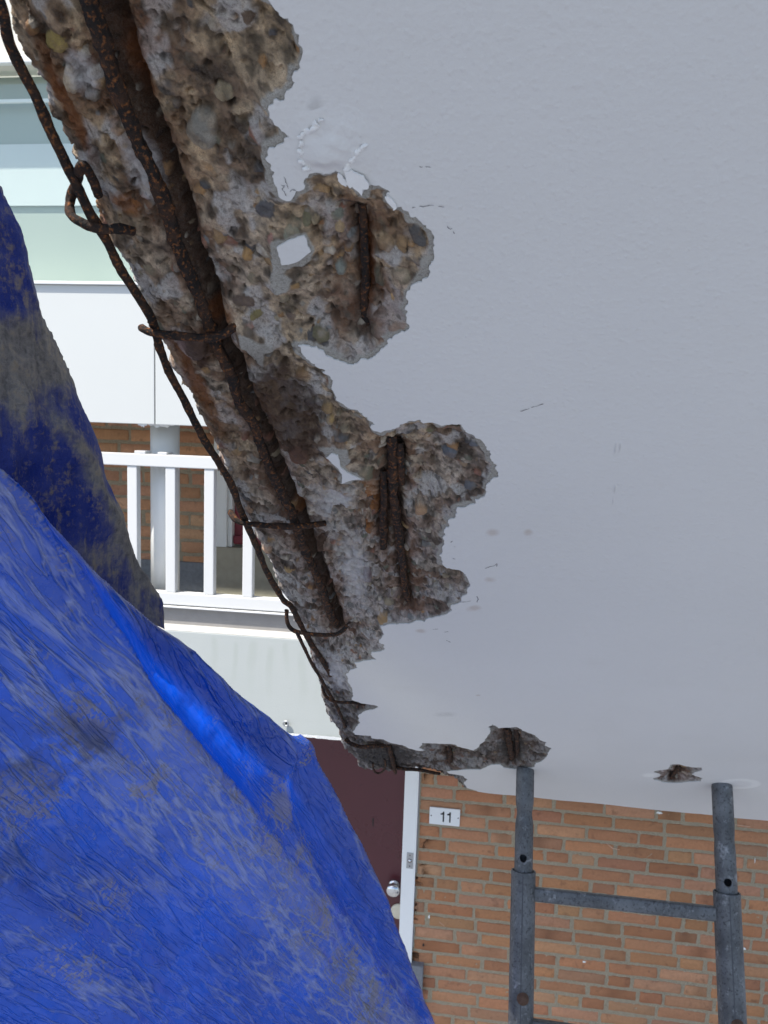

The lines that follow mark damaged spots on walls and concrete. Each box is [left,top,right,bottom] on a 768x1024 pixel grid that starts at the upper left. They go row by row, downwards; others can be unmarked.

spalling [9,0,92,160]
corrosion [15,0,111,190]
corrosion [110,0,170,126]
corrosion [351,195,380,326]
corrosion [146,280,347,521]
spalling [84,0,498,749]
corrosion [309,528,354,628]
spalling [421,725,551,789]
spalling [654,764,702,783]